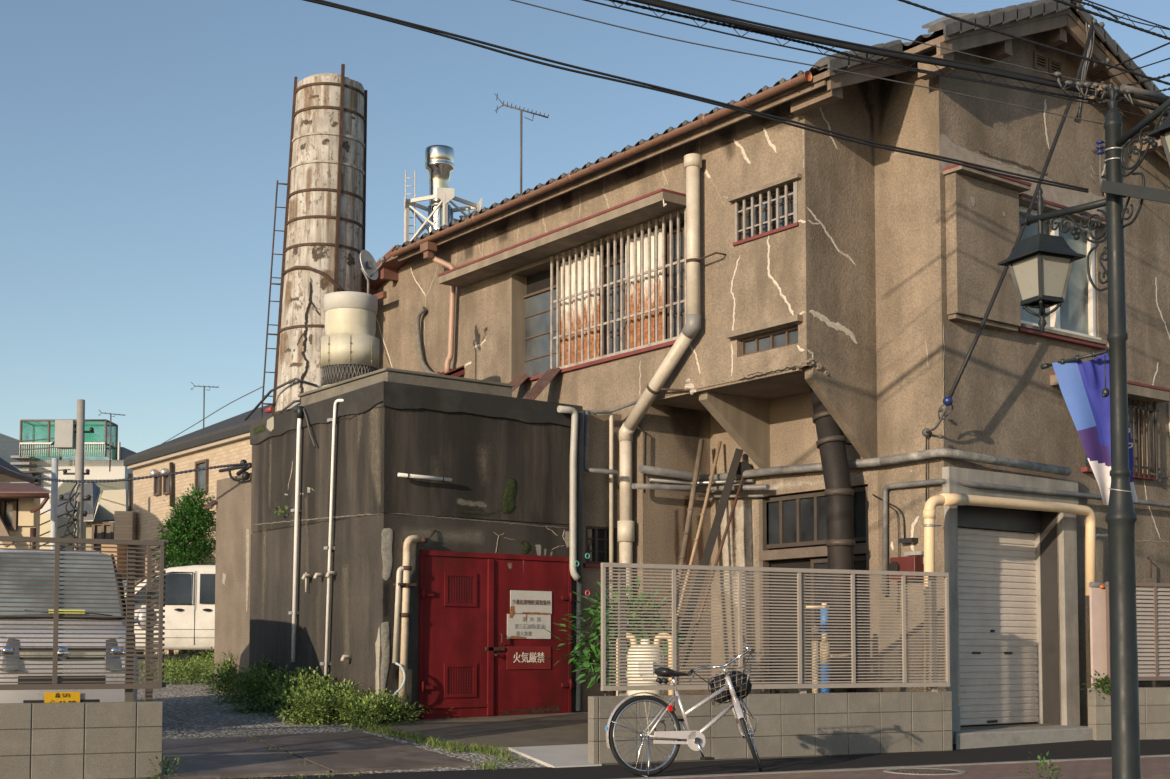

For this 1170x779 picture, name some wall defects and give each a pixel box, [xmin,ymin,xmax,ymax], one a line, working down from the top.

rust [304,85,358,121]
rust [289,169,311,226]
crack [798,207,856,265]
crack [285,277,383,434]
crack [689,345,701,374]
crack [731,235,858,376]
crack [1152,282,1170,385]
spalling [381,528,393,580]
spalling [375,622,390,718]